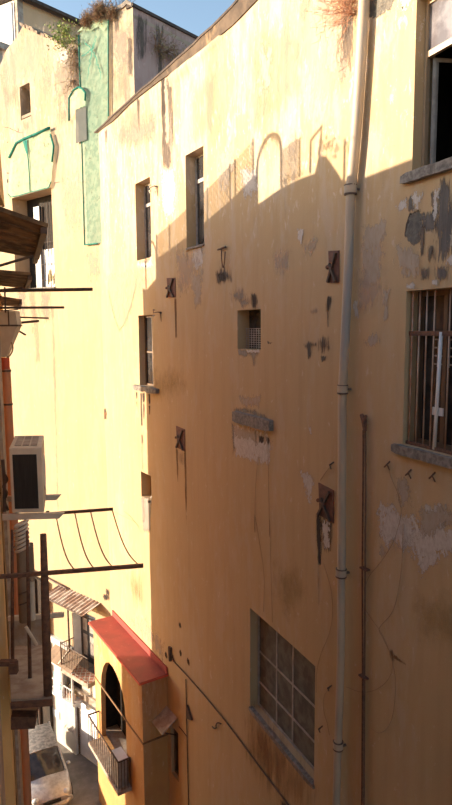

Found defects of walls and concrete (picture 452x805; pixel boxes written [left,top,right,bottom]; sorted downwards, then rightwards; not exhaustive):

spalling [369,0,412,19]
water stain [112,15,174,169]
peeling [217,142,259,200]
flaking render [432,188,440,220]
flaking render [396,191,423,290]
flaking render [232,424,273,465]
flaking render [376,477,452,579]